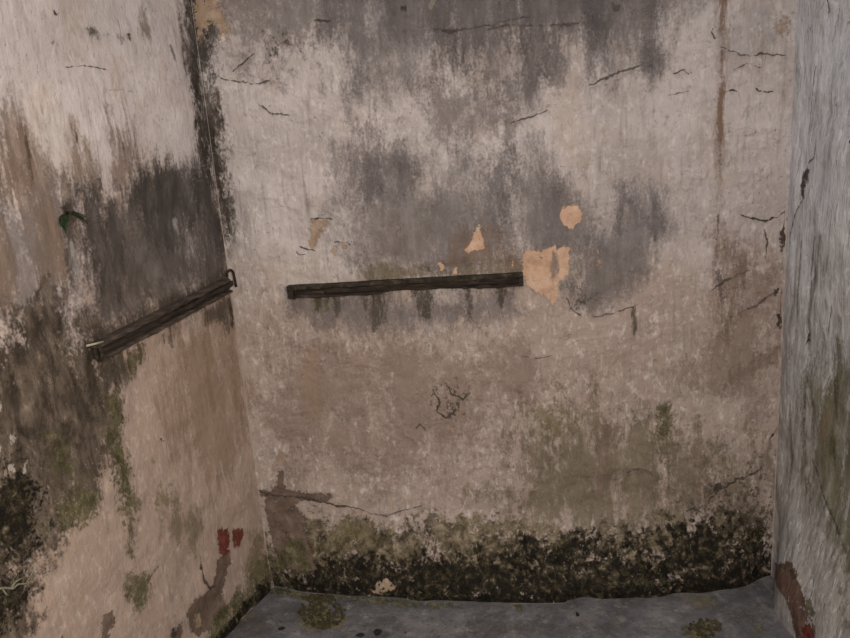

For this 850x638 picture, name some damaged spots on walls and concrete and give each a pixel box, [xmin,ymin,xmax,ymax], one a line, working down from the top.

peeling [193,0,237,43]
damp [221,0,665,149]
rust [717,80,726,161]
damp [0,0,235,638]
damp [163,297,249,488]
peeling [296,217,332,255]
damp [263,288,536,488]
peeling [465,224,485,253]
damp [336,141,667,309]
peeling [509,245,571,305]
peeling [560,204,583,230]
damp [494,402,775,545]